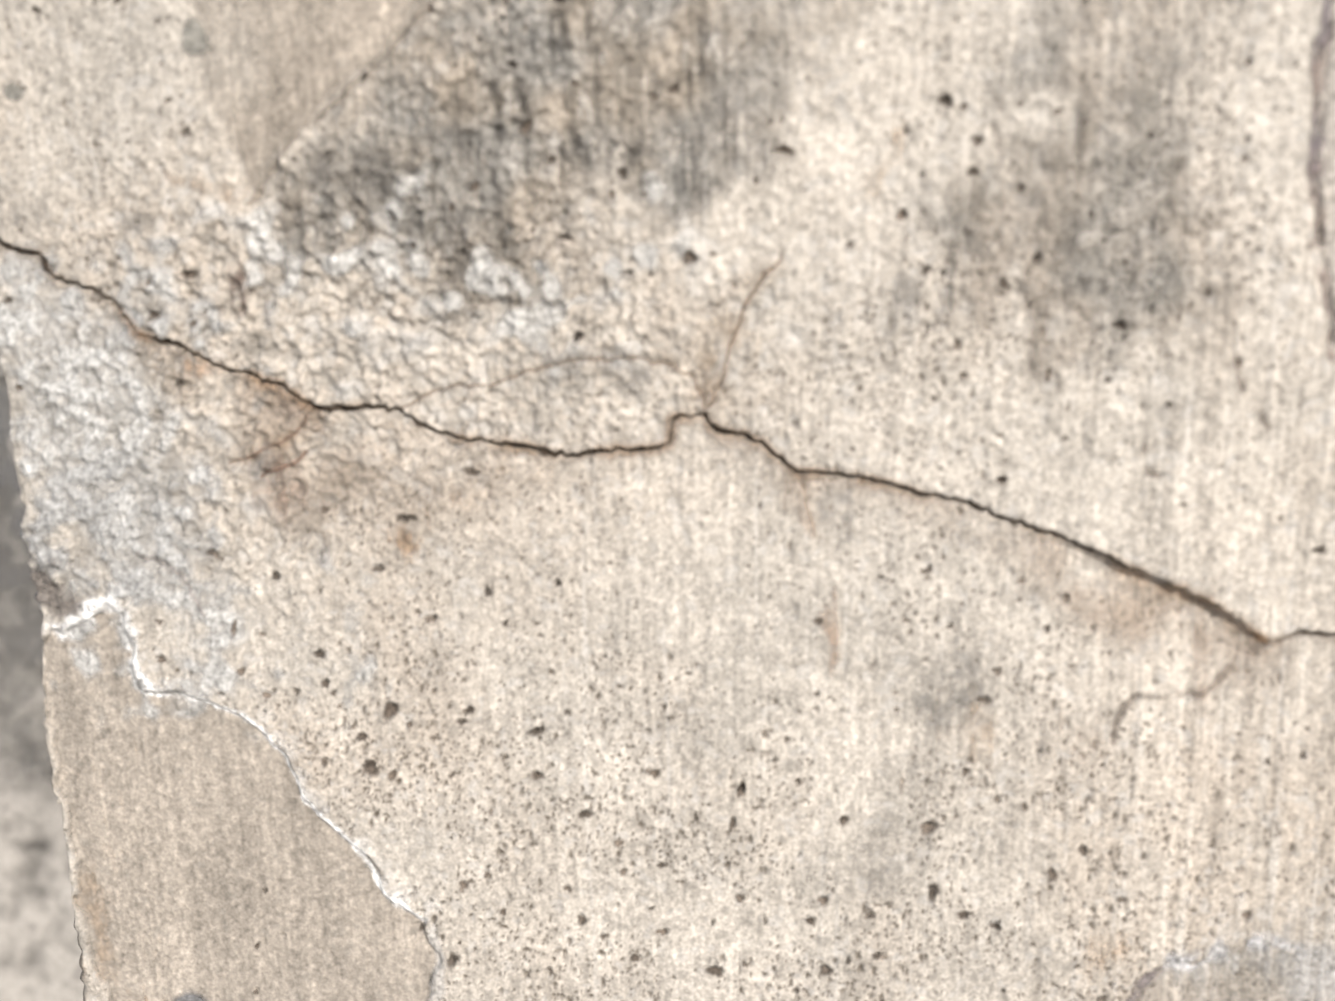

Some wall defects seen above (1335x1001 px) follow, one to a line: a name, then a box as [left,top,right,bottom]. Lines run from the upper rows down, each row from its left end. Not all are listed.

crack [0,239,854,477]
crack [896,485,1335,697]
spalling [30,570,461,1001]
spalling [706,966,722,977]